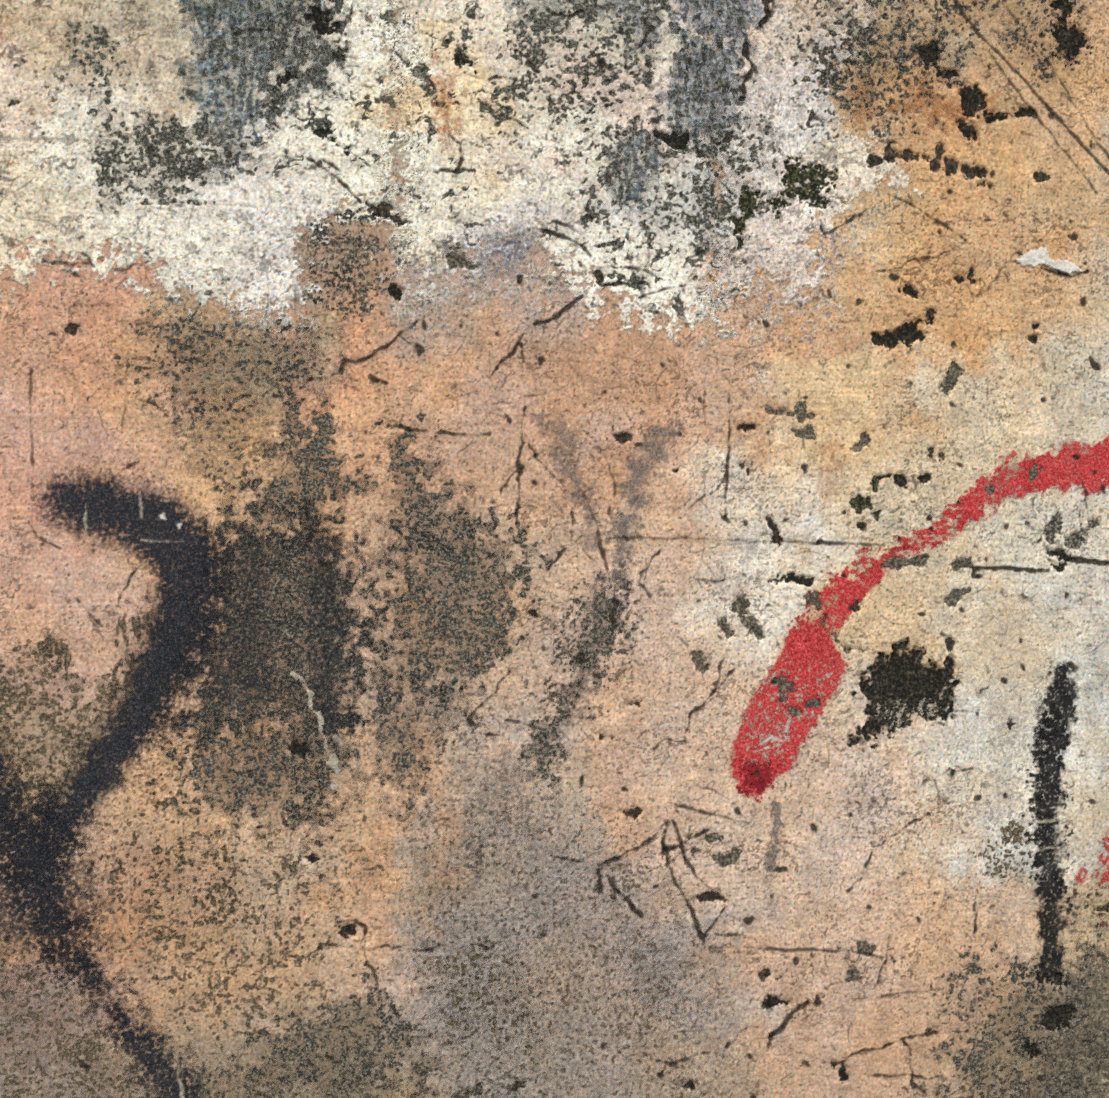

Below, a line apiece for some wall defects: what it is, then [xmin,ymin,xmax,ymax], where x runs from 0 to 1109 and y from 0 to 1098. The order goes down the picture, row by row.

crack [877,194,966,272]
peeling [1016,247,1090,277]
crack [561,820,725,943]
crack [832,1031,939,1094]